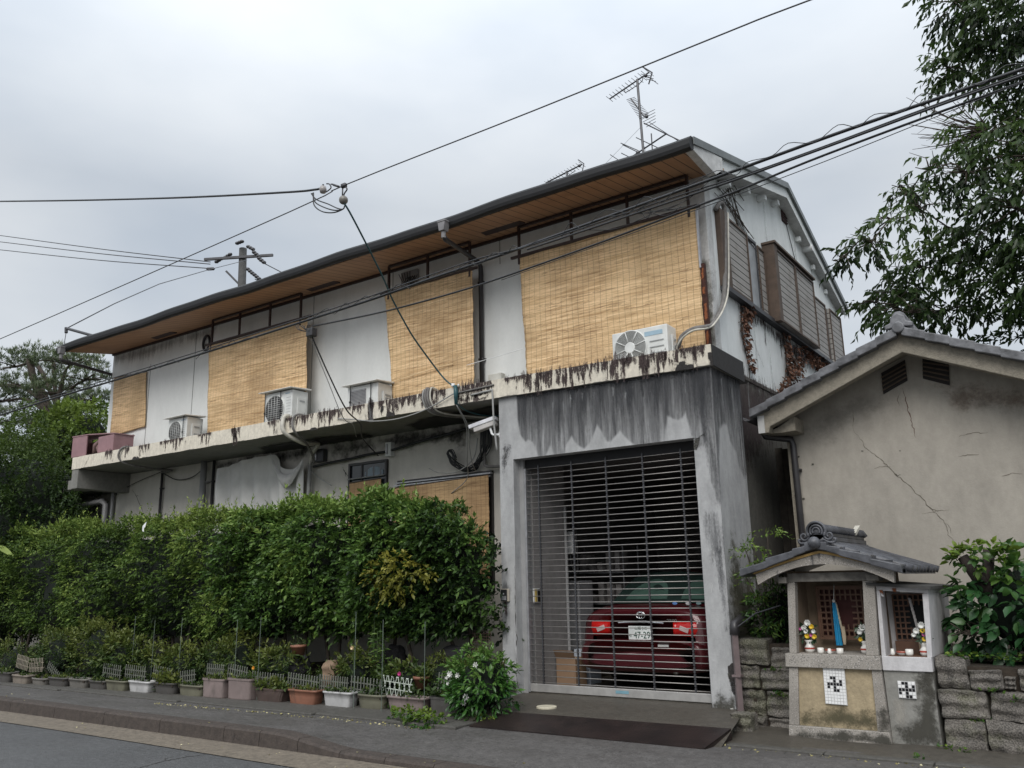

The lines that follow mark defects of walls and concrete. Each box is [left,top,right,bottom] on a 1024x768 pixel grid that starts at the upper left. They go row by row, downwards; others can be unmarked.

damp [517,367,782,478]
crack [853,417,951,537]